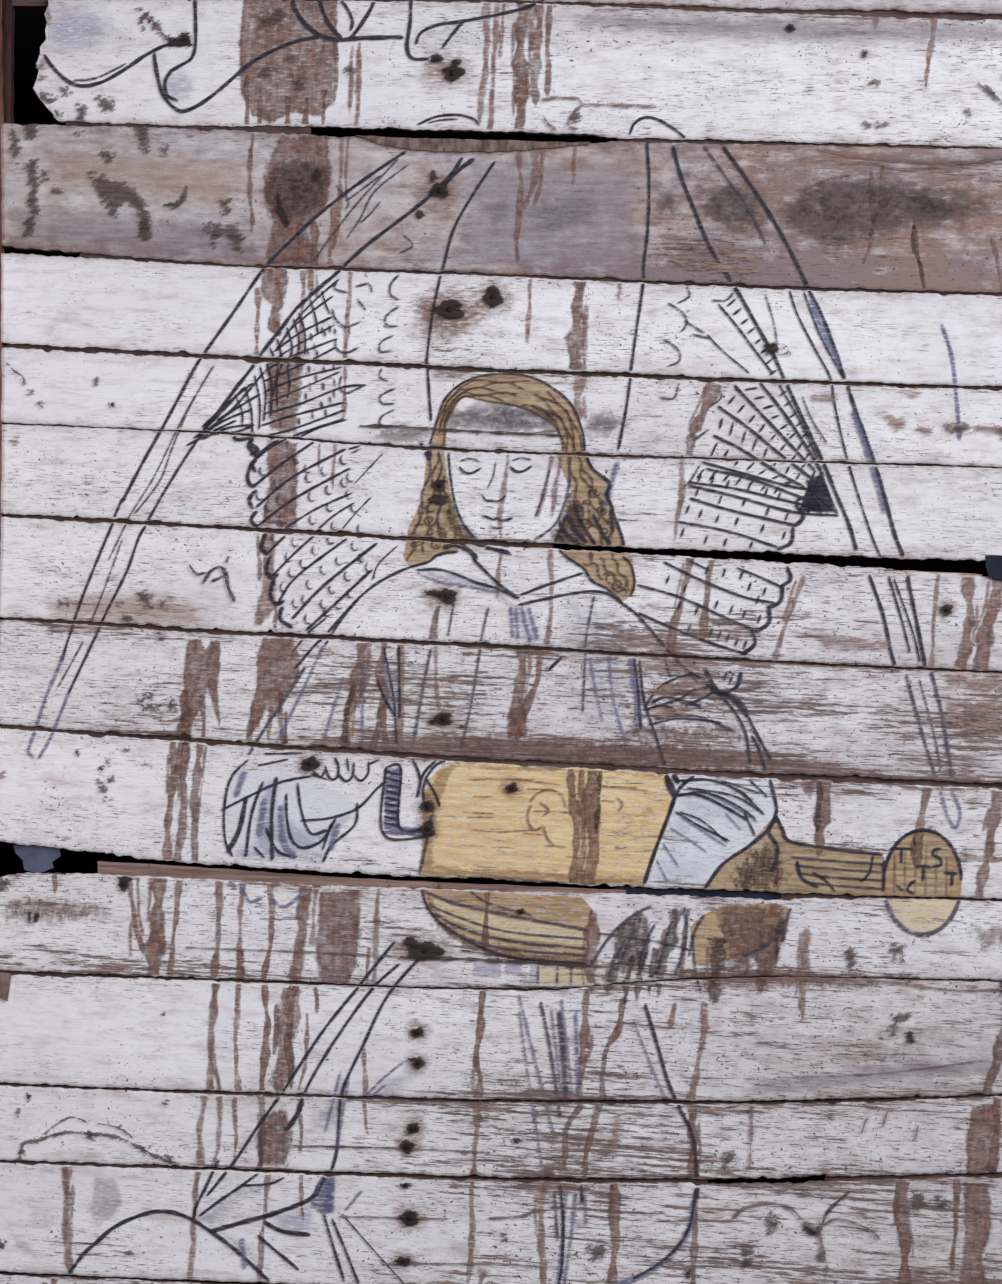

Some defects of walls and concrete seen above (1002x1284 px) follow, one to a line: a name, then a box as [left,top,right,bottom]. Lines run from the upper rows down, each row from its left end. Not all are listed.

leakage [239,0,362,744]
leakage [789,167,970,288]